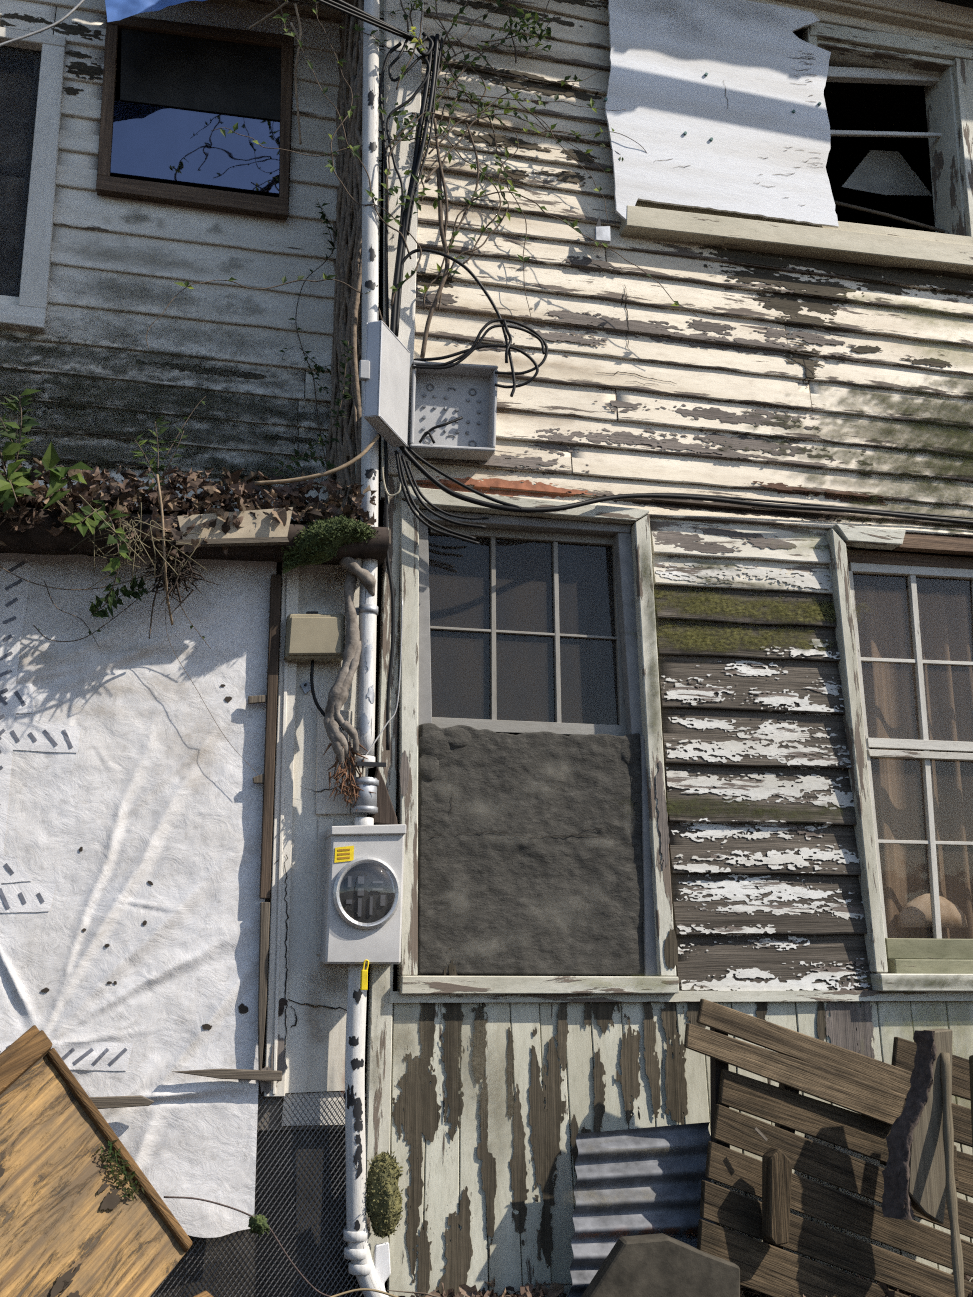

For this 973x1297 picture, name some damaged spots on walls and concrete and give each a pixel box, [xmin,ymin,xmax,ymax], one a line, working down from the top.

peeling [0,13,105,95]
peeling [422,56,602,104]
peeling [448,0,608,27]
peeling [448,129,600,186]
peeling [437,246,973,388]
leakage [0,334,331,480]
leakage [650,561,835,652]
peeling [392,639,875,1297]